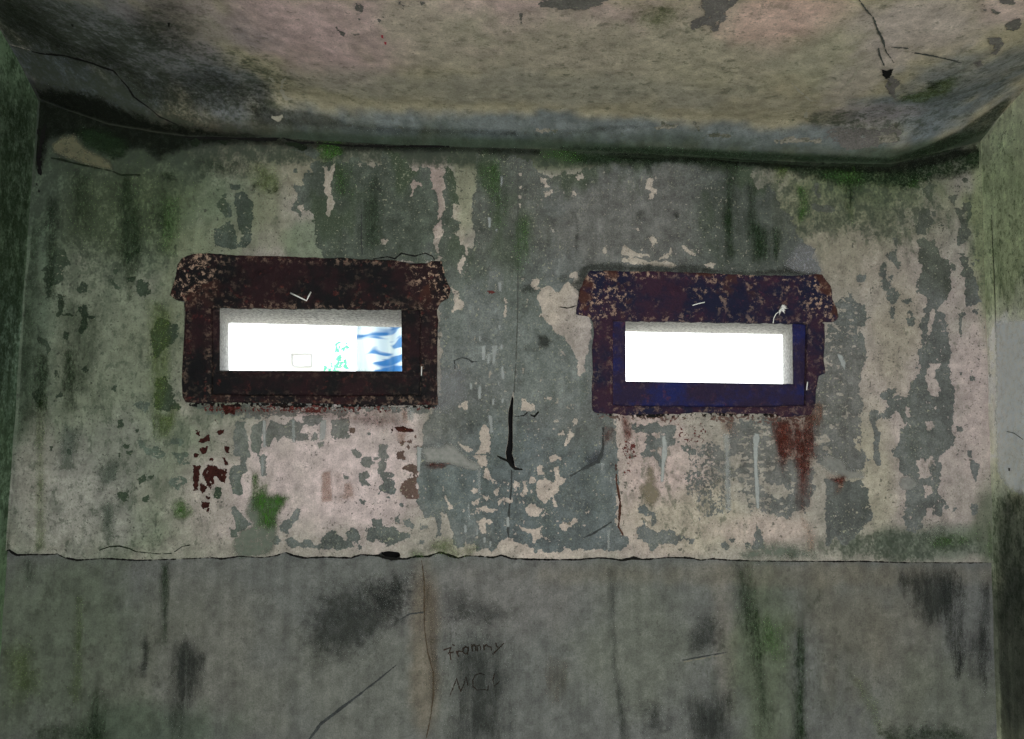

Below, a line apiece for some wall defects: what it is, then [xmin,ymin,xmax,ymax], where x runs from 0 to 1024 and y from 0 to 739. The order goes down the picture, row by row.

crack [859,0,961,67]
crack [10,44,449,151]
peeling [135,146,982,558]
peeling [117,419,190,490]
corrosion [193,404,235,512]
crack [7,164,982,739]
corrosion [776,420,814,495]
damp [899,571,963,671]